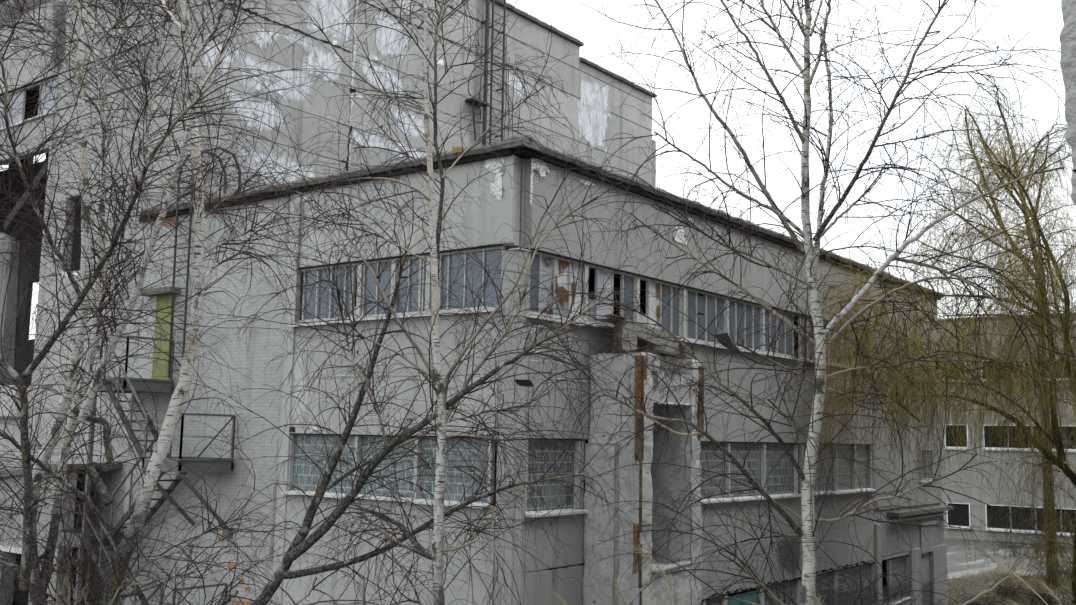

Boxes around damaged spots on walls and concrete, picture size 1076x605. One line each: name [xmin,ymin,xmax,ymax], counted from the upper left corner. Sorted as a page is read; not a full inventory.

flaking render [484,157,505,200]
corrosion [635,355,648,448]